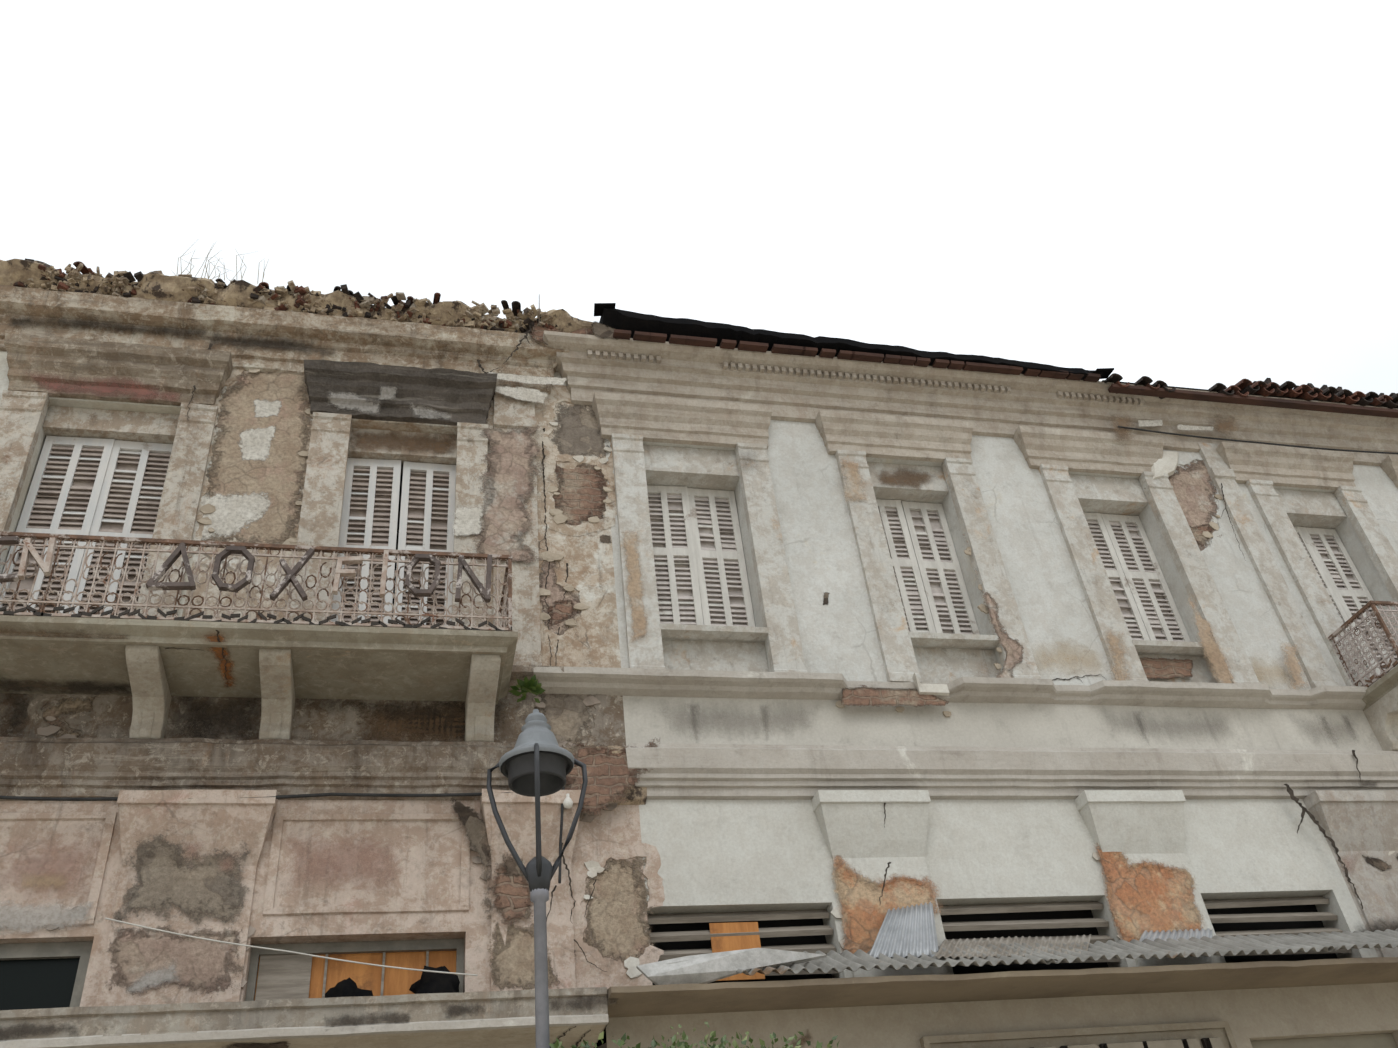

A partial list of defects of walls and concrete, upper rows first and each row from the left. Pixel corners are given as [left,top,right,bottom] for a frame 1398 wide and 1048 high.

spalling [453,372,647,648]
spalling [1168,452,1230,560]
rust [205,635,234,687]
spalling [963,534,1024,678]
spalling [517,693,657,822]
spalling [106,830,256,994]
spalling [572,842,665,986]
spalling [830,855,941,954]
spalling [1092,844,1203,942]
crack [1283,784,1363,909]